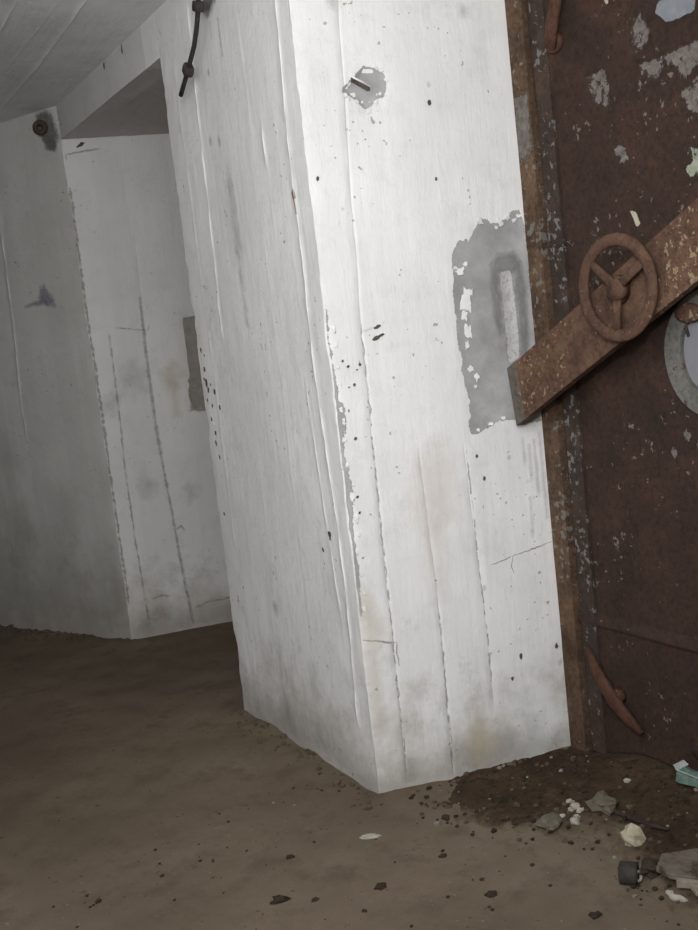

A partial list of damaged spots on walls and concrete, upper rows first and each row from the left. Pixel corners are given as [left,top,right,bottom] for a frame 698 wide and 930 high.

spalling [342,64,389,114]
peeling [452,210,535,434]